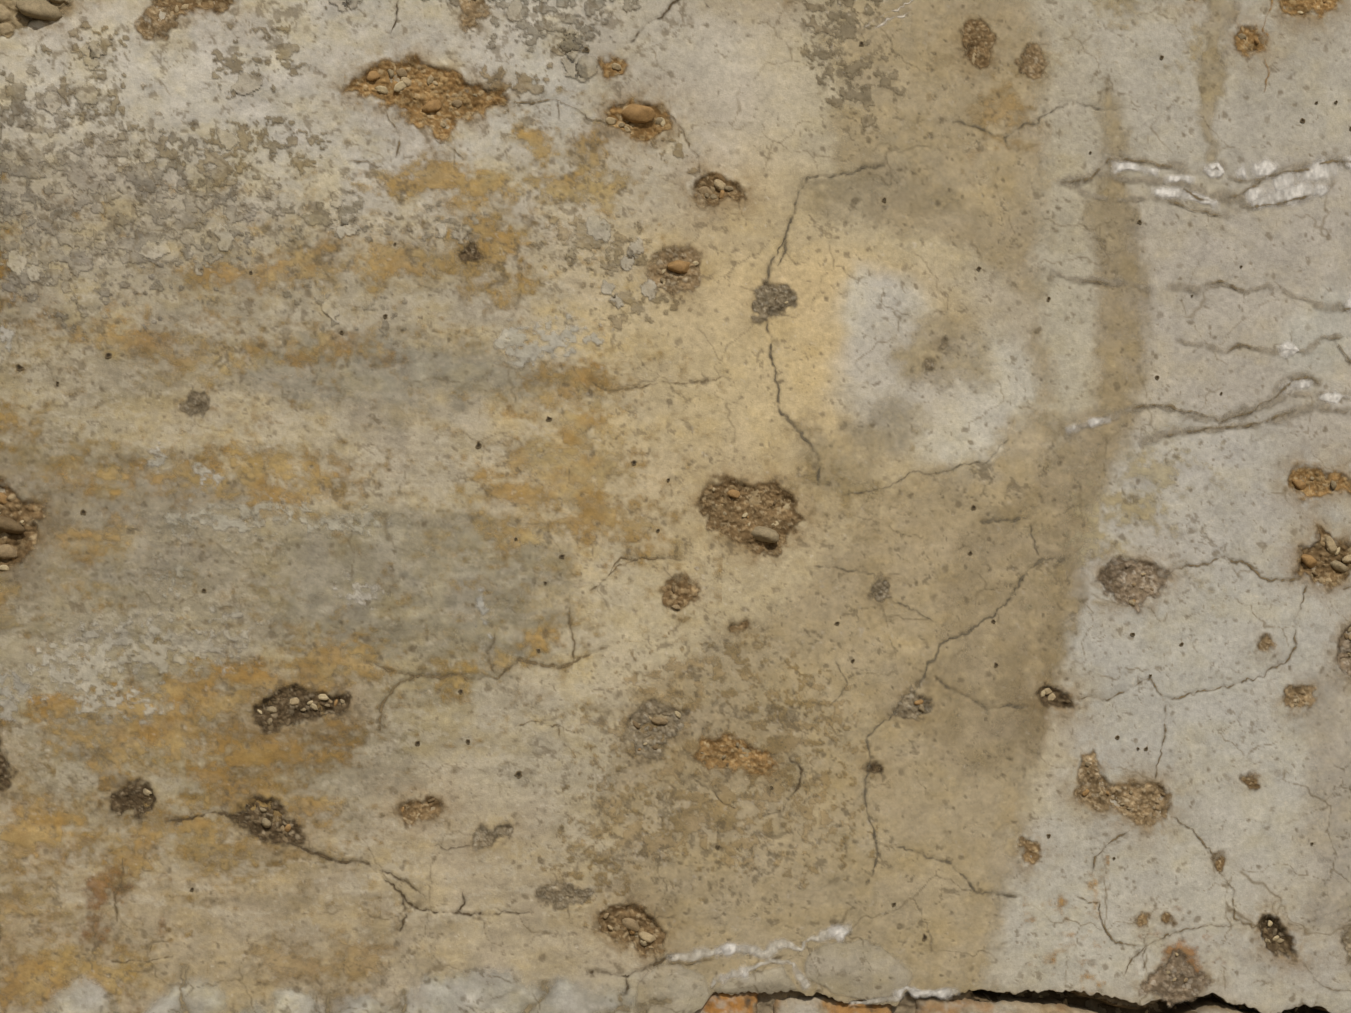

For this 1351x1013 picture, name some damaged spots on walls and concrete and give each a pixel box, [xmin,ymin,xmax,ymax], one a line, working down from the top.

spalling [345,0,641,141]
peeling [0,0,488,336]
crack [1072,158,1351,215]
crack [766,323,820,480]
spalling [697,475,804,557]
spalling [1295,525,1351,589]
spalling [254,684,351,734]
crack [1081,558,1307,777]
crack [864,708,1017,897]
spalling [1074,750,1172,826]
crack [286,836,520,930]
crack [1080,817,1263,971]